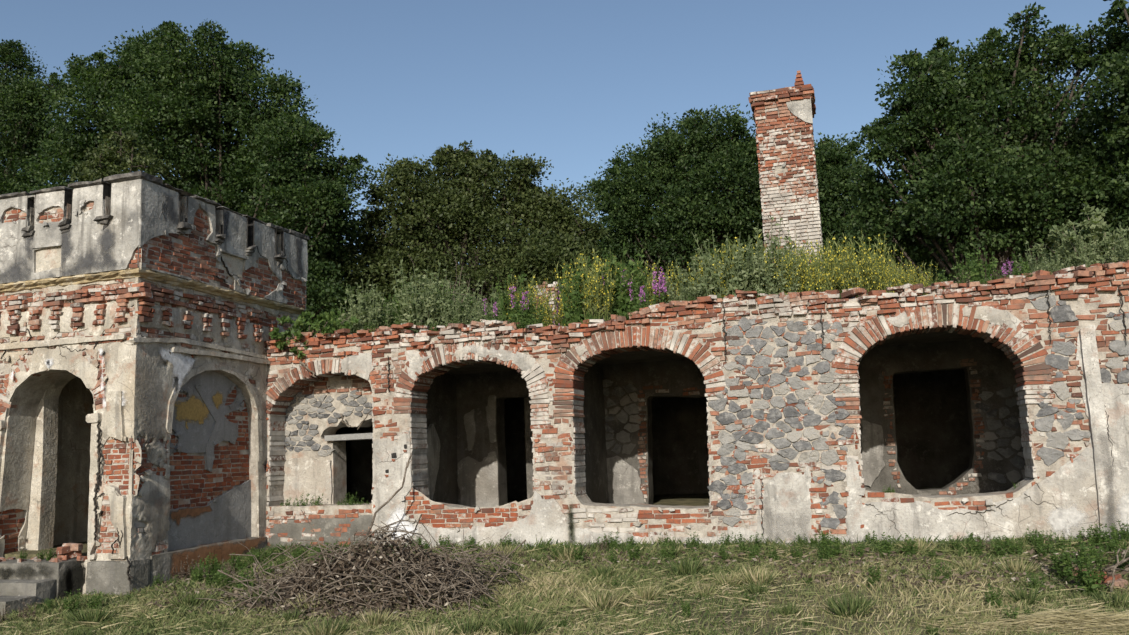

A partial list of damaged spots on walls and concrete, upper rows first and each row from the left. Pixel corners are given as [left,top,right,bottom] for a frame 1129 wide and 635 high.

spalling [129,203,308,311]
crack [213,256,239,283]
crack [1104,404,1114,466]
spalling [91,386,249,557]
spalling [0,509,25,554]